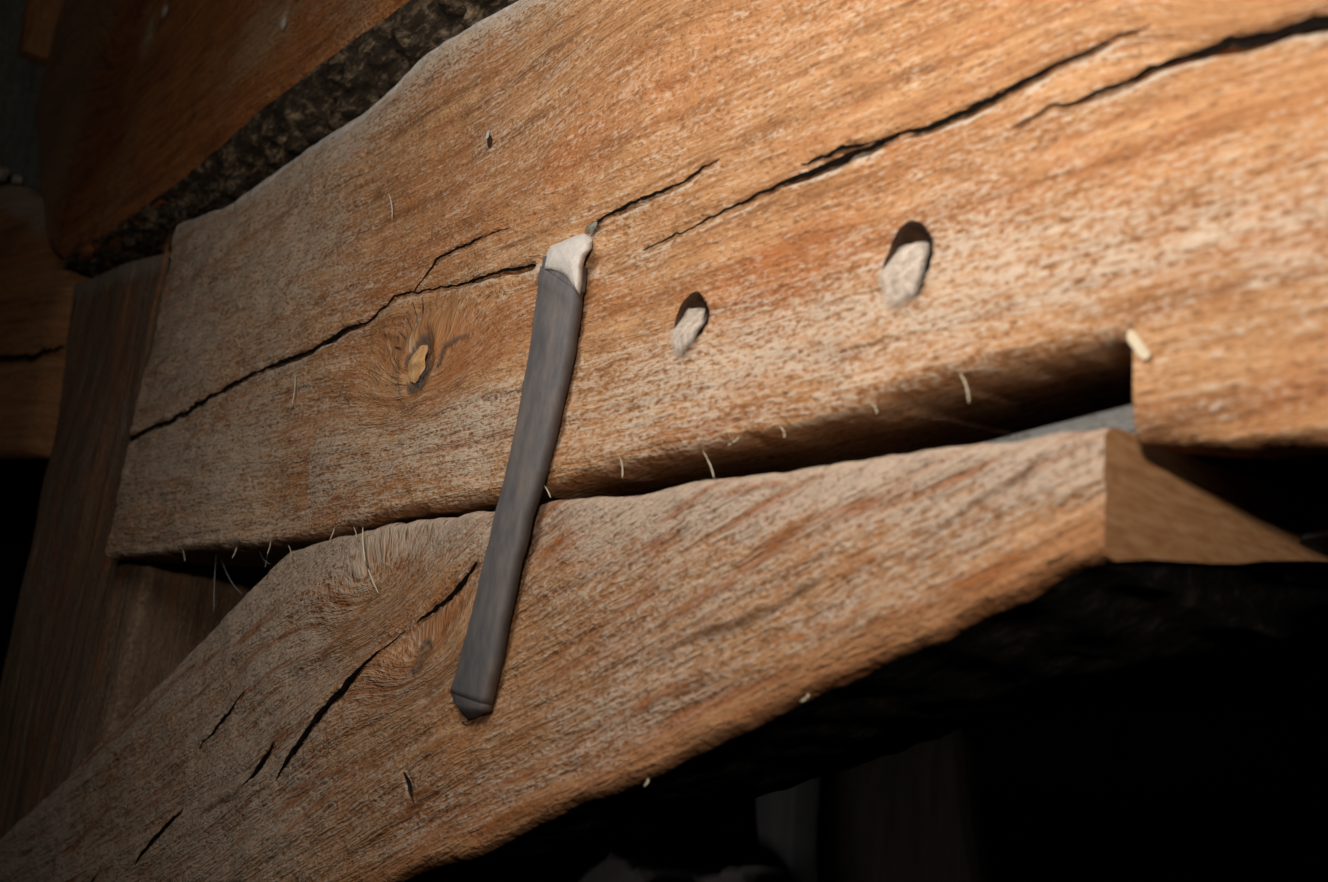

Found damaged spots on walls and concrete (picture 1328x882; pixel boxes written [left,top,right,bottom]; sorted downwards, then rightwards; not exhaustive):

crack [595,159,719,225]
crack [642,14,1328,251]
crack [129,228,536,440]
crack [199,691,244,749]
crack [241,561,477,786]